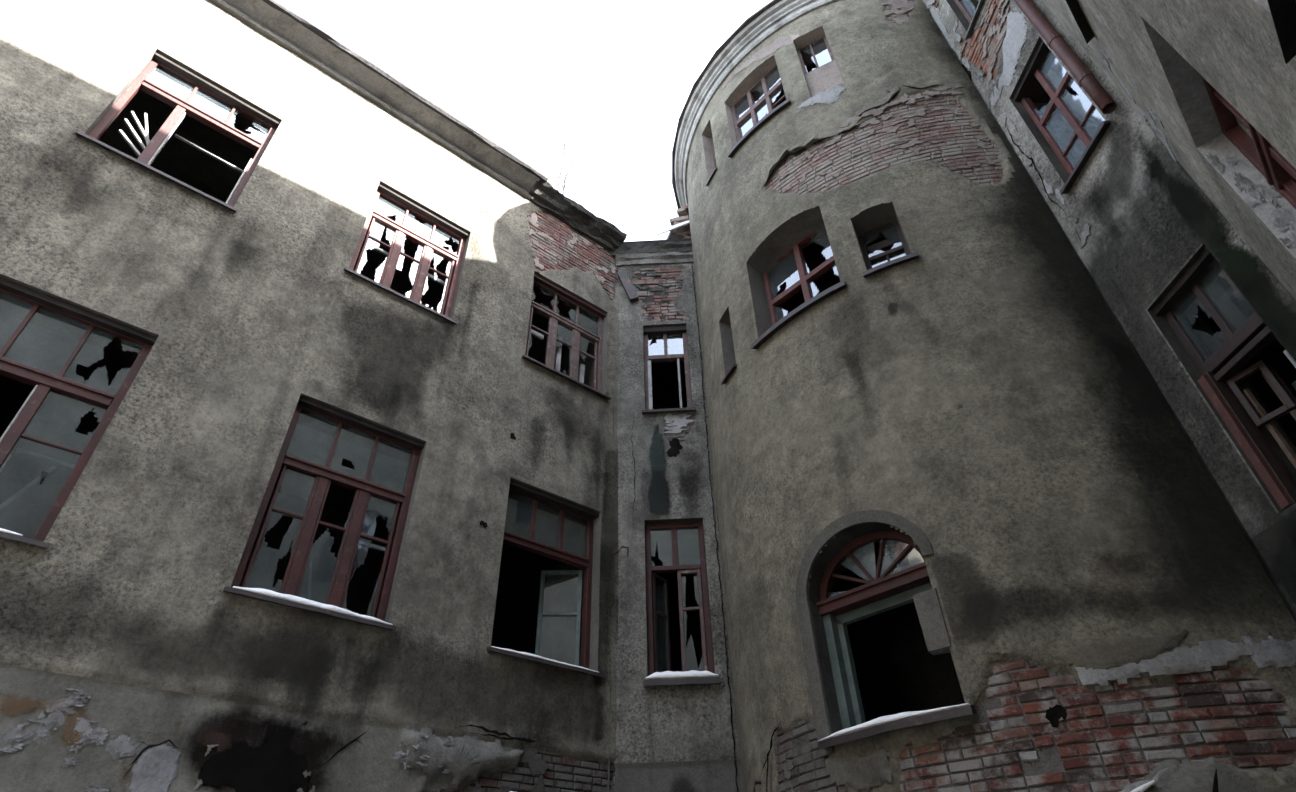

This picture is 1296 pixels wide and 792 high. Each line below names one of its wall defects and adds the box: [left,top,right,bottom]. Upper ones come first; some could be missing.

leakage [929,11,963,68]
flaking render [764,0,1032,195]
flaking render [1205,153,1296,249]
flaking render [526,211,689,322]
leakage [345,305,449,409]
leakage [964,82,1296,628]
leakage [649,425,669,514]
flaking render [663,413,695,457]
peeling [0,688,139,765]
flaking render [775,720,848,792]
flaking render [898,658,1296,792]
crack [1211,769,1219,792]